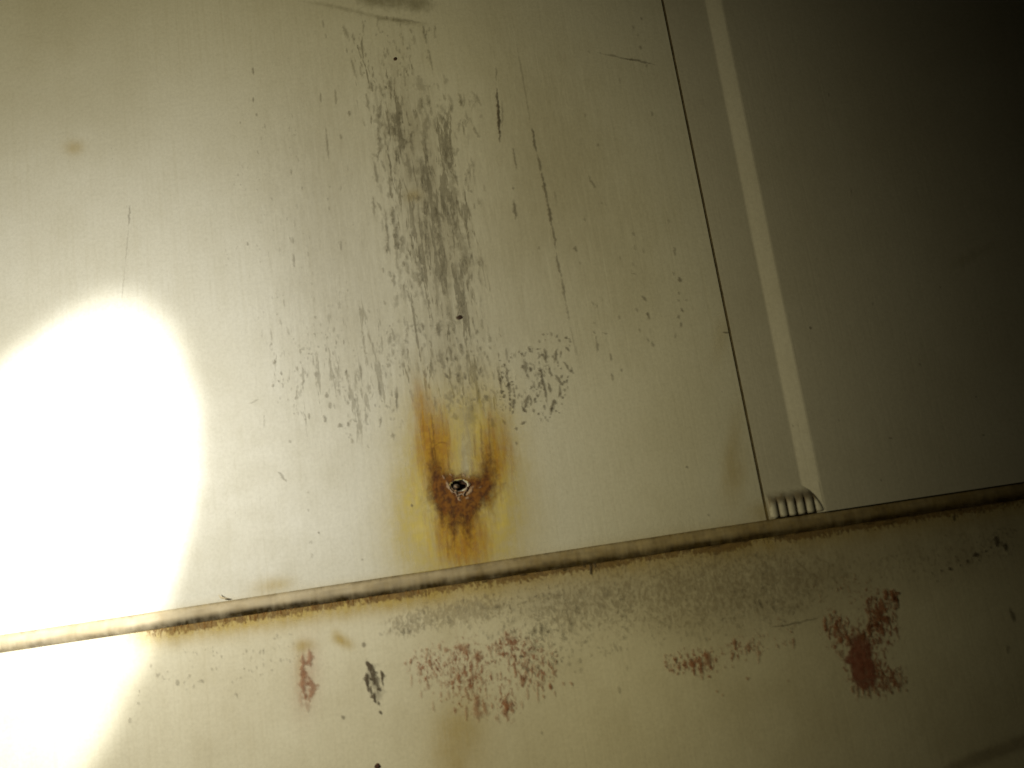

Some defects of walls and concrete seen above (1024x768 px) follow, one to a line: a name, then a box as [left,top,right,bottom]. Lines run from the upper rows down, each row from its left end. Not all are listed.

corrosion [398,399,515,571]
corrosion [1,499,1024,653]